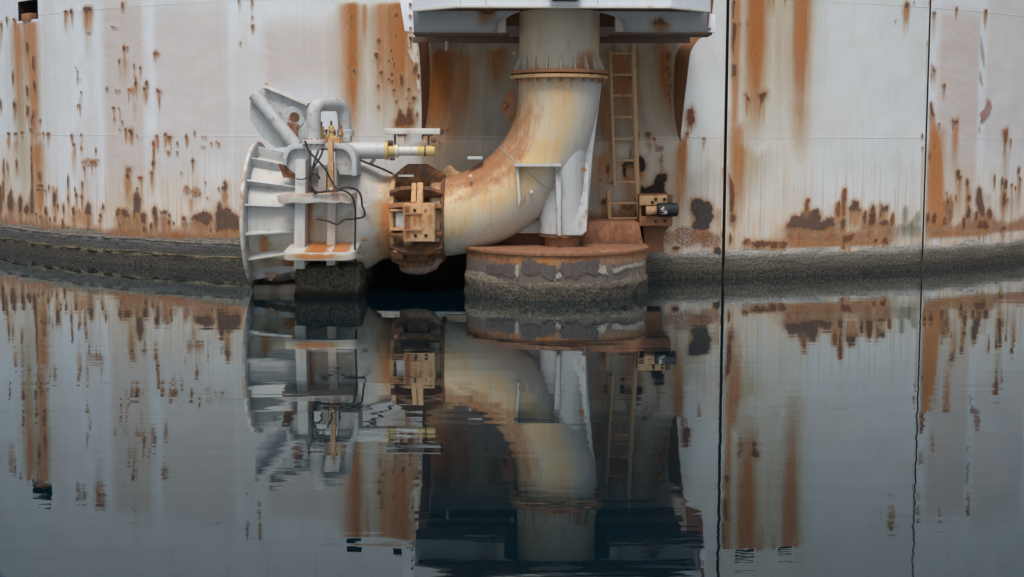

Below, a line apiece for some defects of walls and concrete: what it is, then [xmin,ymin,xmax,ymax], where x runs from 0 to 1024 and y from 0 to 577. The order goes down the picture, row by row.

rust [63,6,92,25]
rust [0,16,240,239]
rust [377,195,432,245]
rust [342,3,470,143]
rust [540,249,644,264]
rust [590,0,807,255]
rust [785,188,895,247]
rust [922,102,1024,242]